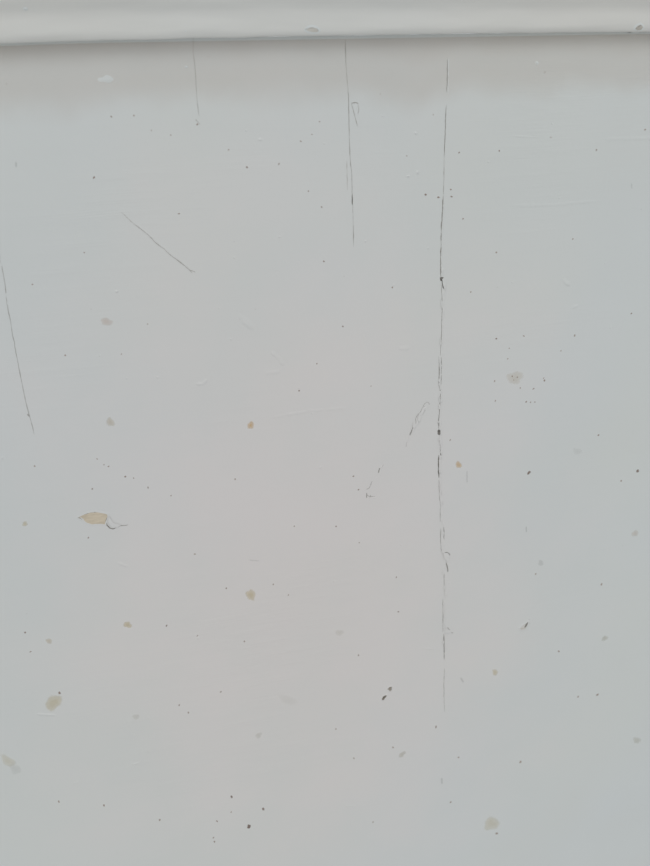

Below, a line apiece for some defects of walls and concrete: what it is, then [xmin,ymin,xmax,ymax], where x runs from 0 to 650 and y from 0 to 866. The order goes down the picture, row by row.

peeling [75,510,127,539]
crack [437,58,453,712]